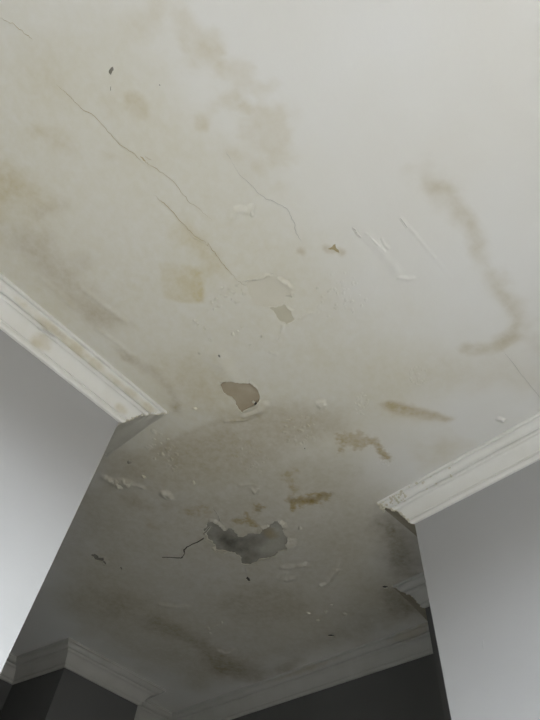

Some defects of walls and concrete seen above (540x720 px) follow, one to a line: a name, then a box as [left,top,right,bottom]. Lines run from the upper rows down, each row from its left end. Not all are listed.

crack [56,84,274,286]
water stain [0,0,540,498]
spalling [219,380,263,413]
crack [162,508,223,560]
water stain [30,446,428,701]
spalling [203,518,302,582]